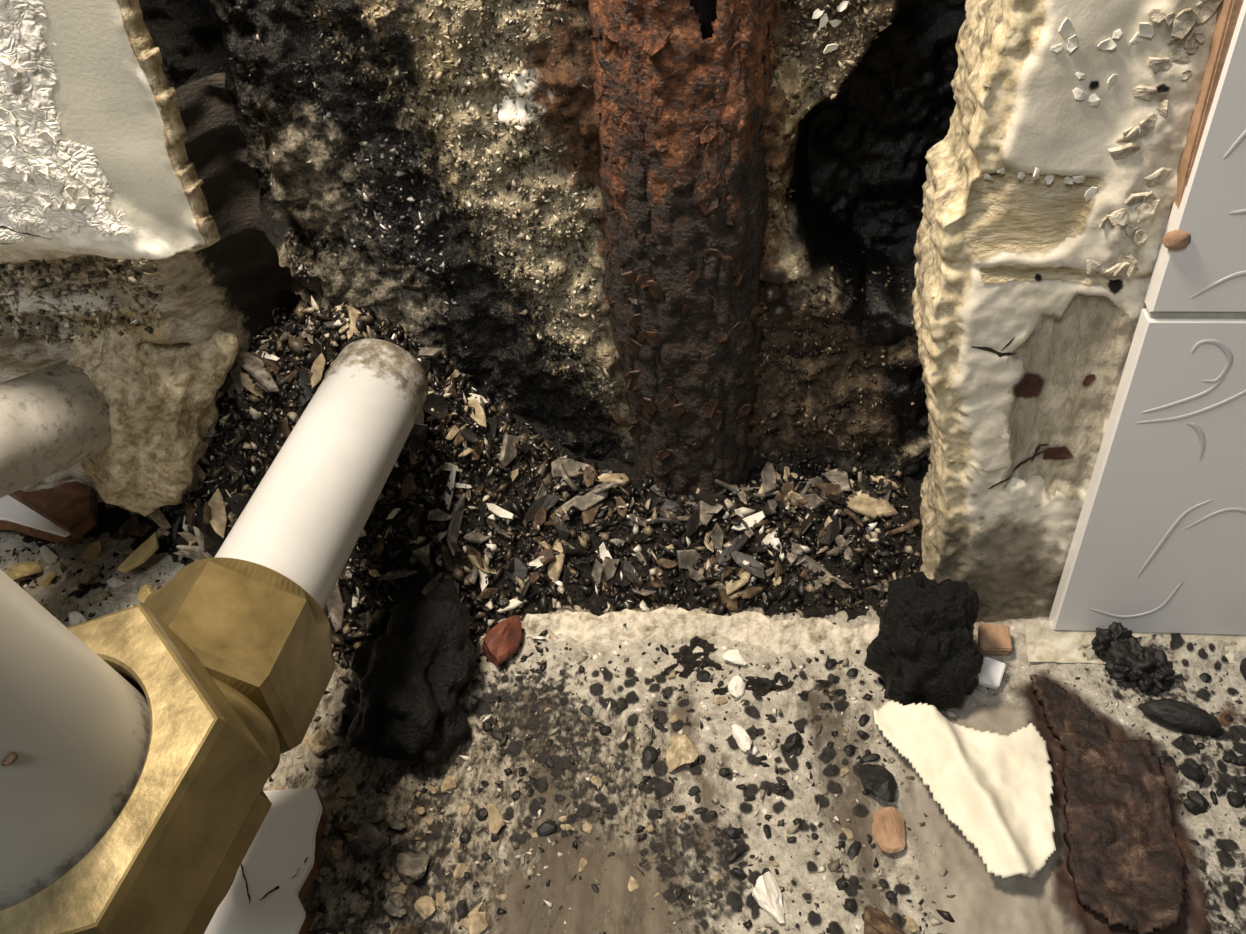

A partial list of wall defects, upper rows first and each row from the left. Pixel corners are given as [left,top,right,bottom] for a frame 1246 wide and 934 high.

leakage [208,0,624,461]
rust [518,0,621,260]
rust [590,270,685,438]
hole [690,0,717,39]
rust [715,0,798,353]
peeling [812,1,849,28]
spalling [961,167,1171,499]
spalling [1097,0,1222,159]